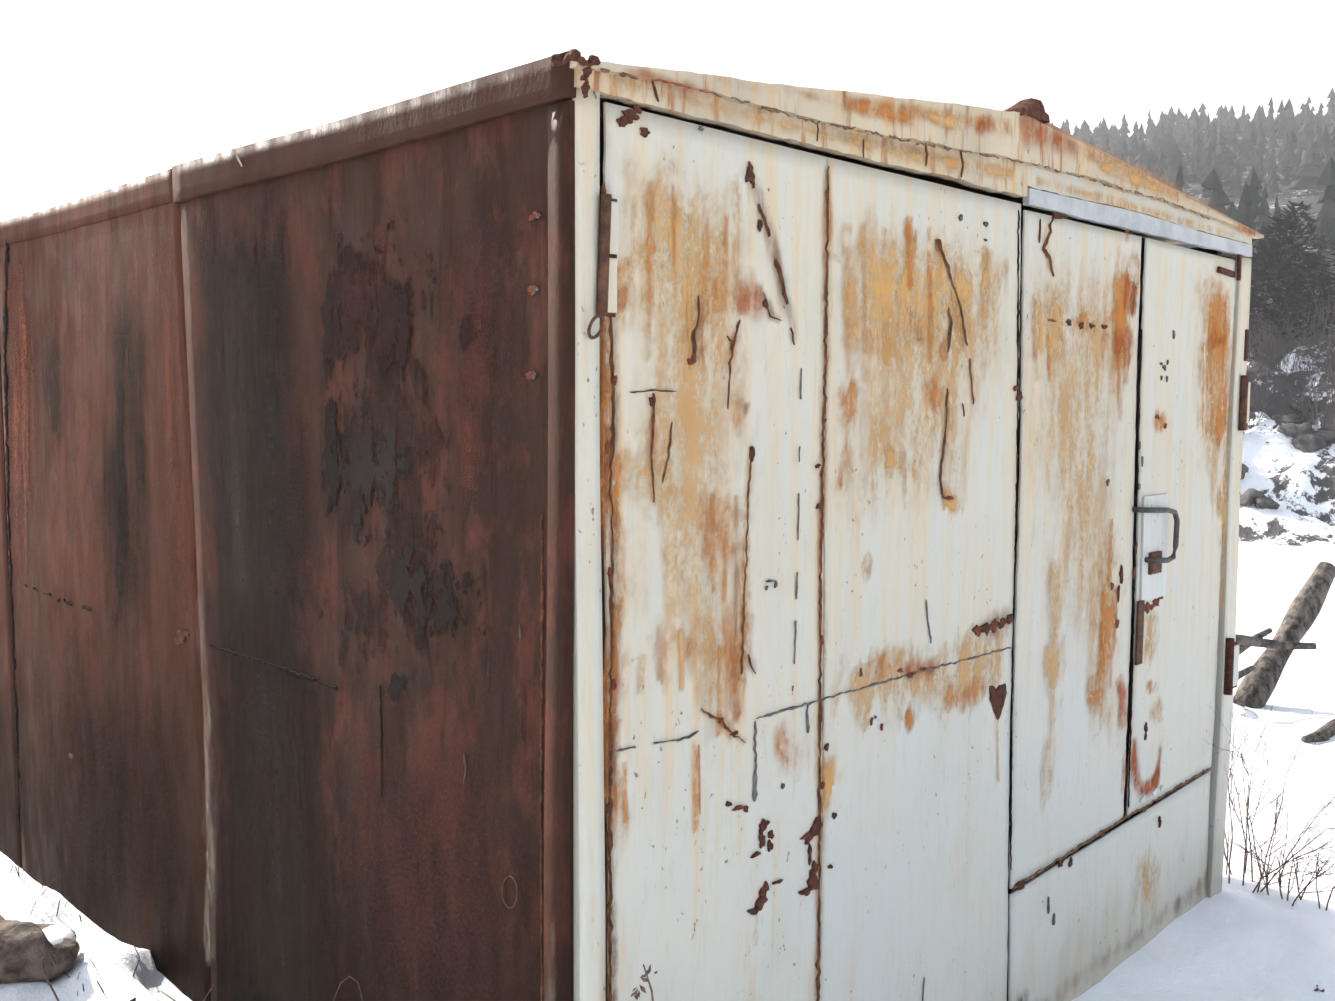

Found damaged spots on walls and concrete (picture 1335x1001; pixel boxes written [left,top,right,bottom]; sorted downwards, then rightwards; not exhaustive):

corrosion [847,101,1008,132]
corrosion [1024,121,1178,194]
corrosion [7,267,32,575]
corrosion [600,364,622,544]
corrosion [639,179,761,735]
corrosion [842,220,990,478]
corrosion [1035,265,1139,722]
corrosion [1203,294,1230,565]
corrosion [603,599,628,822]
peeling [725,801,749,812]
corrosion [851,632,1007,730]
corrosion [1124,741,1160,794]